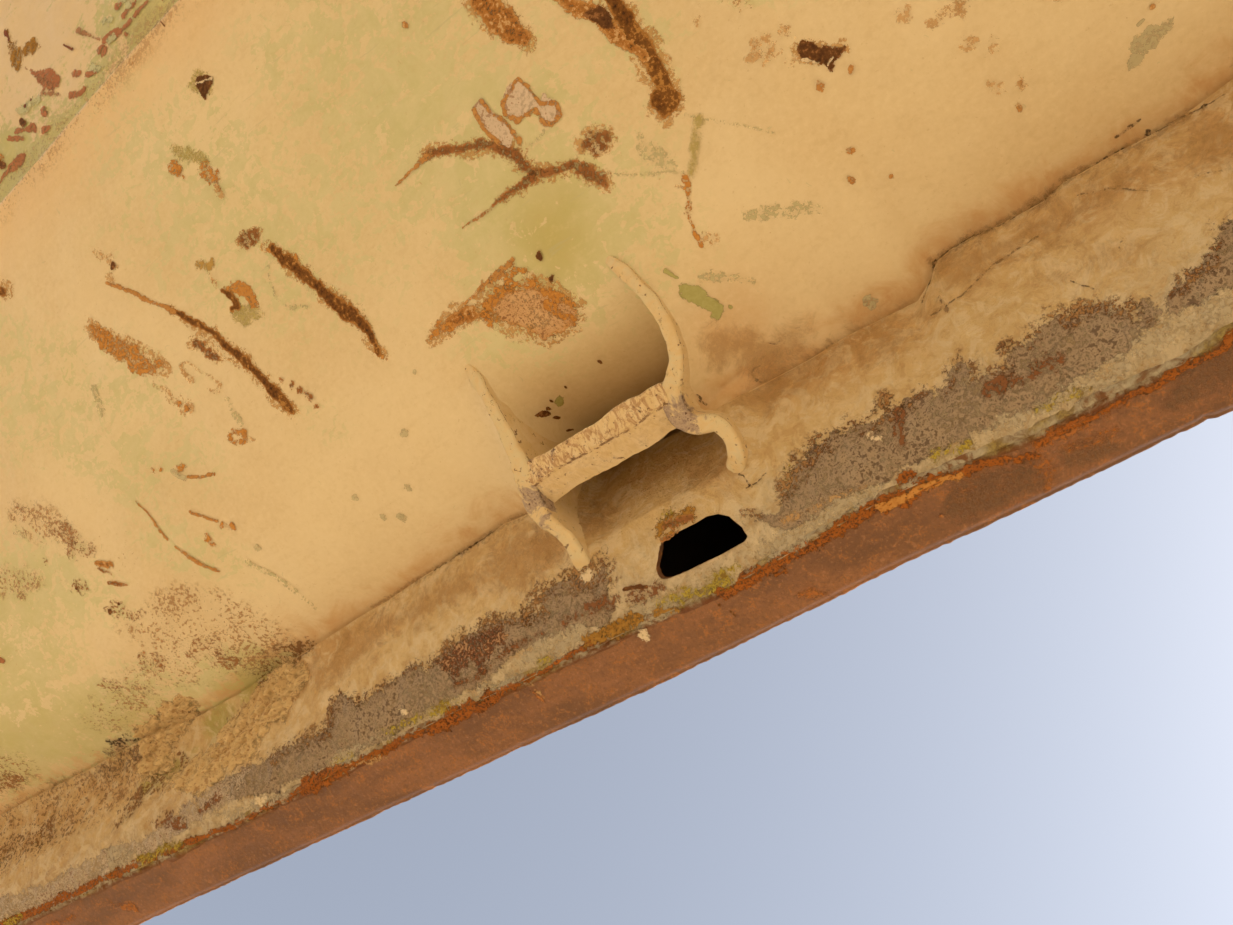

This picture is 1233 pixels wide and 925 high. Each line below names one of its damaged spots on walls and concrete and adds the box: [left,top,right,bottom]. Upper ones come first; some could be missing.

corrosion [4,29,41,71]
corrosion [461,0,537,54]
peeling [471,77,562,148]
corrosion [574,124,618,159]
corrosion [554,0,684,129]
crack [922,94,1224,315]
corrosion [84,249,319,417]
corrosion [234,226,388,360]
corrosion [426,251,587,348]
corrosion [712,328,1233,617]
corrosion [89,587,314,728]
corrosion [0,641,599,925]